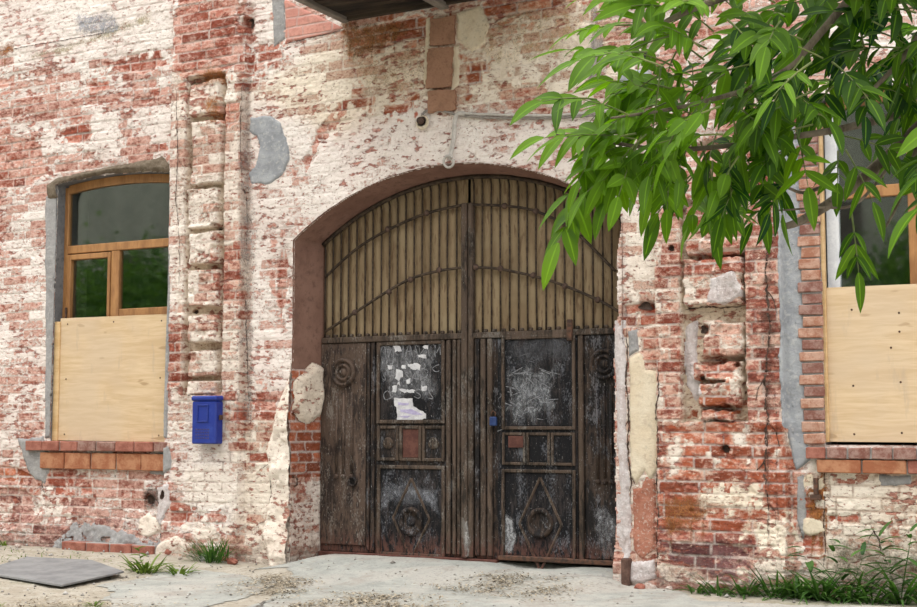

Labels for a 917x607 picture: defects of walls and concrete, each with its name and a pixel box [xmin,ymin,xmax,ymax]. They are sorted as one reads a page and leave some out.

peeling [0,0,294,199]
peeling [290,77,422,197]
spalling [338,9,435,63]
spalling [457,50,554,130]
peeling [148,378,290,538]
rust [665,497,708,543]
spalling [613,194,917,595]
crack [755,250,780,531]